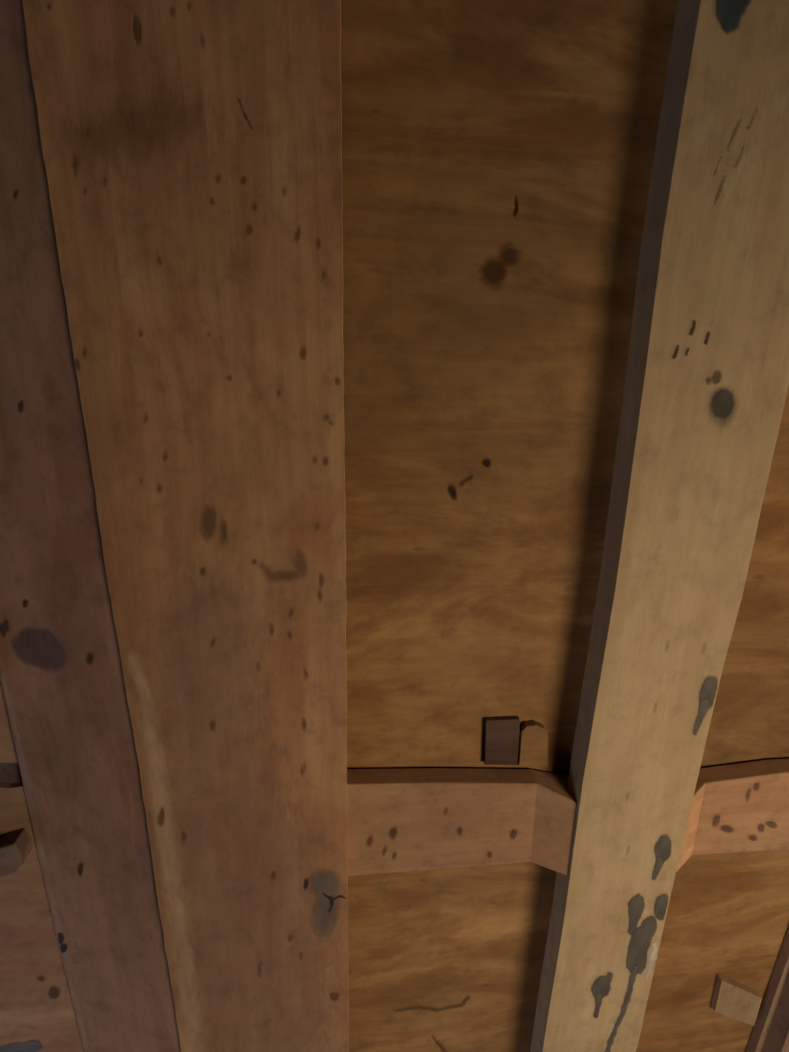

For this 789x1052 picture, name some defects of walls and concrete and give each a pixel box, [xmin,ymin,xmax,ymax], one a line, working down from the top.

damp [716,0,751,34]
damp [707,371,734,418]
damp [13,630,65,669]
damp [693,677,718,735]
damp [652,835,671,880]
damp [591,972,613,1018]
damp [606,894,668,1052]